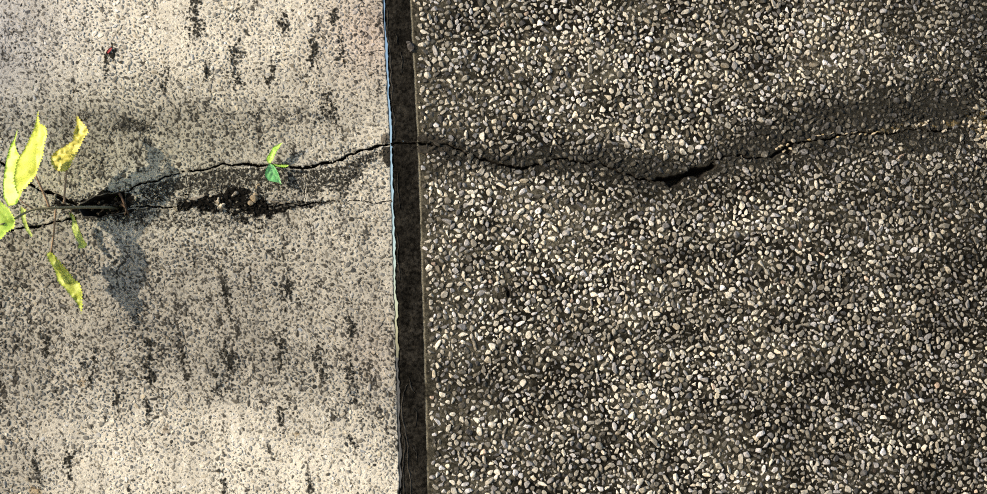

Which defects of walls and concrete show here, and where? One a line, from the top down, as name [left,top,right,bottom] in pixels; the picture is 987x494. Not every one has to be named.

crack [0,160,82,234]
crack [125,140,652,210]
crack [711,153,767,165]
crack [795,127,965,145]
spalling [0,0,417,494]